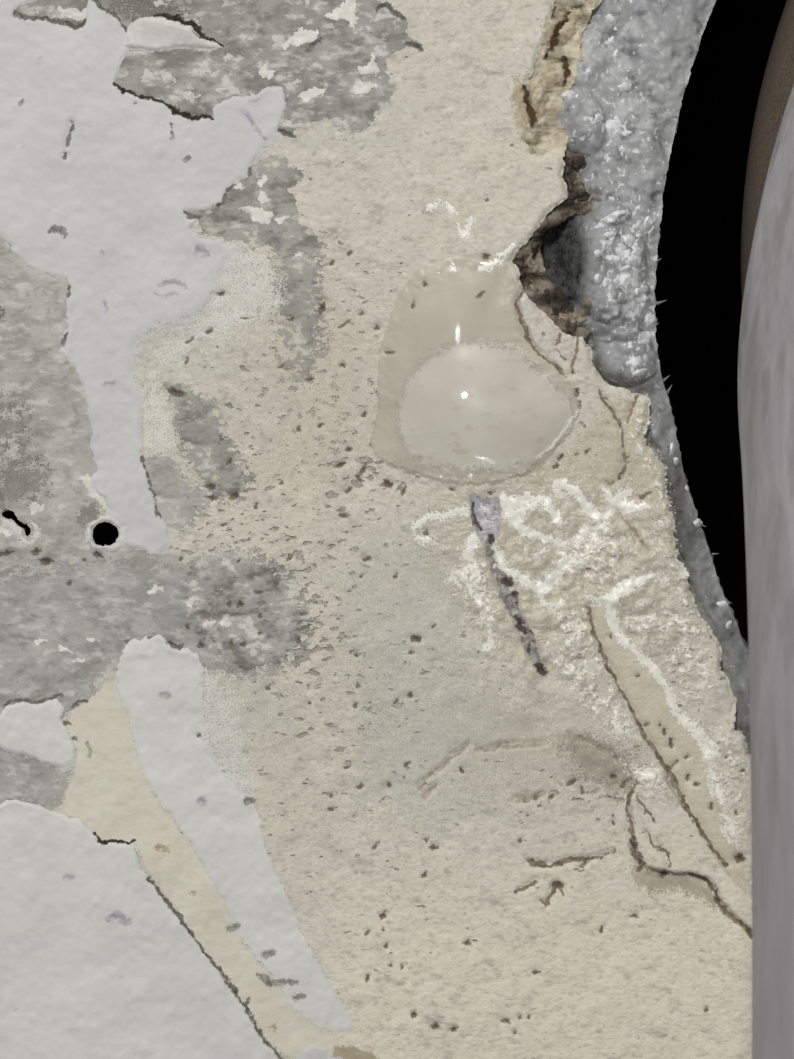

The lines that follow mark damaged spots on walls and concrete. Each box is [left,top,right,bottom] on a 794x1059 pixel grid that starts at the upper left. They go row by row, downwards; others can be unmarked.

peeling [0,0,423,1059]
water stain [226,269,752,864]
crack [514,607,752,939]
spalling [512,0,787,754]